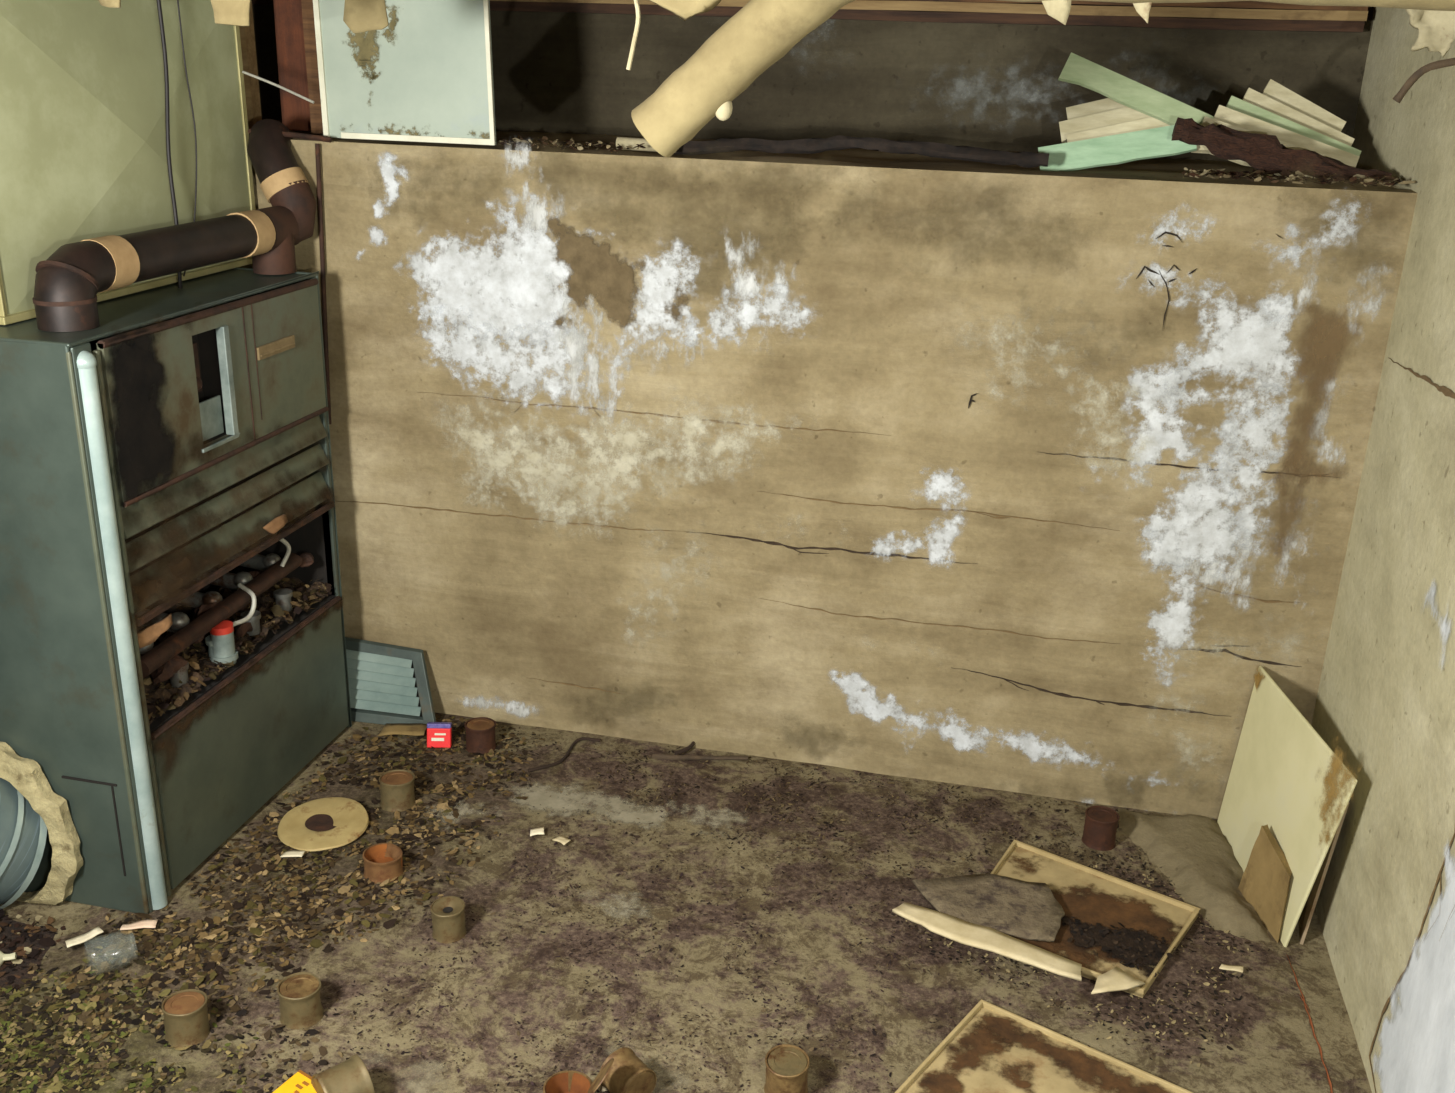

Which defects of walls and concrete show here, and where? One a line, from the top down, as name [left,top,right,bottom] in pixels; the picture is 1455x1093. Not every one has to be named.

leakage [1151,216,1213,247]
leakage [1275,200,1358,261]
leakage [400,148,810,523]
leakage [1082,264,1382,686]
crack [337,501,976,564]
crack [1182,645,1301,667]
leakage [831,670,1096,763]
crack [954,668,1231,717]